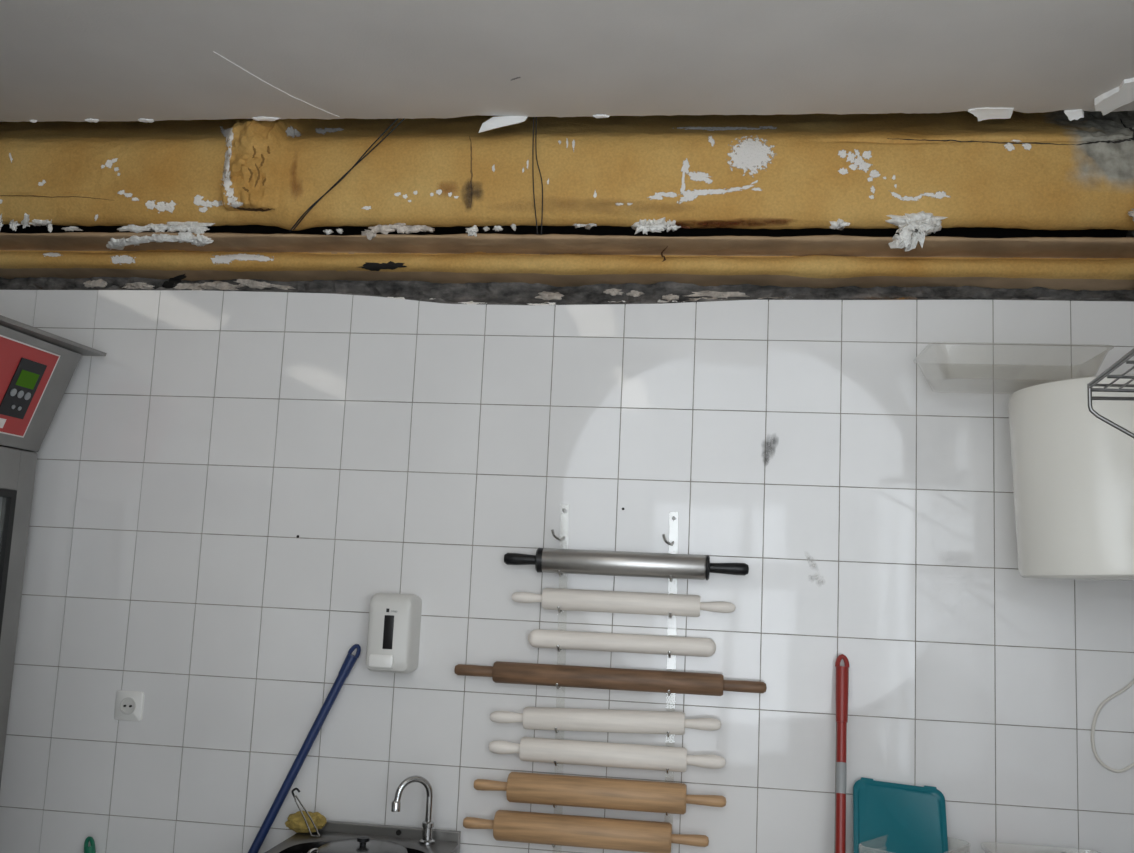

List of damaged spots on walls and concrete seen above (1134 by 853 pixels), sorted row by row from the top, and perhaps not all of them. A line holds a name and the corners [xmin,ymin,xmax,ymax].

peeling [968,107,1014,121]
peeling [478,116,527,133]
crack [887,119,1134,145]
spalling [193,126,270,213]
peeling [648,126,777,204]
peeling [838,149,950,201]
peeling [117,190,176,213]
peeling [111,255,136,265]
peeling [211,253,274,264]
spalling [122,274,295,290]
spalling [603,288,644,302]
spalling [658,291,790,302]